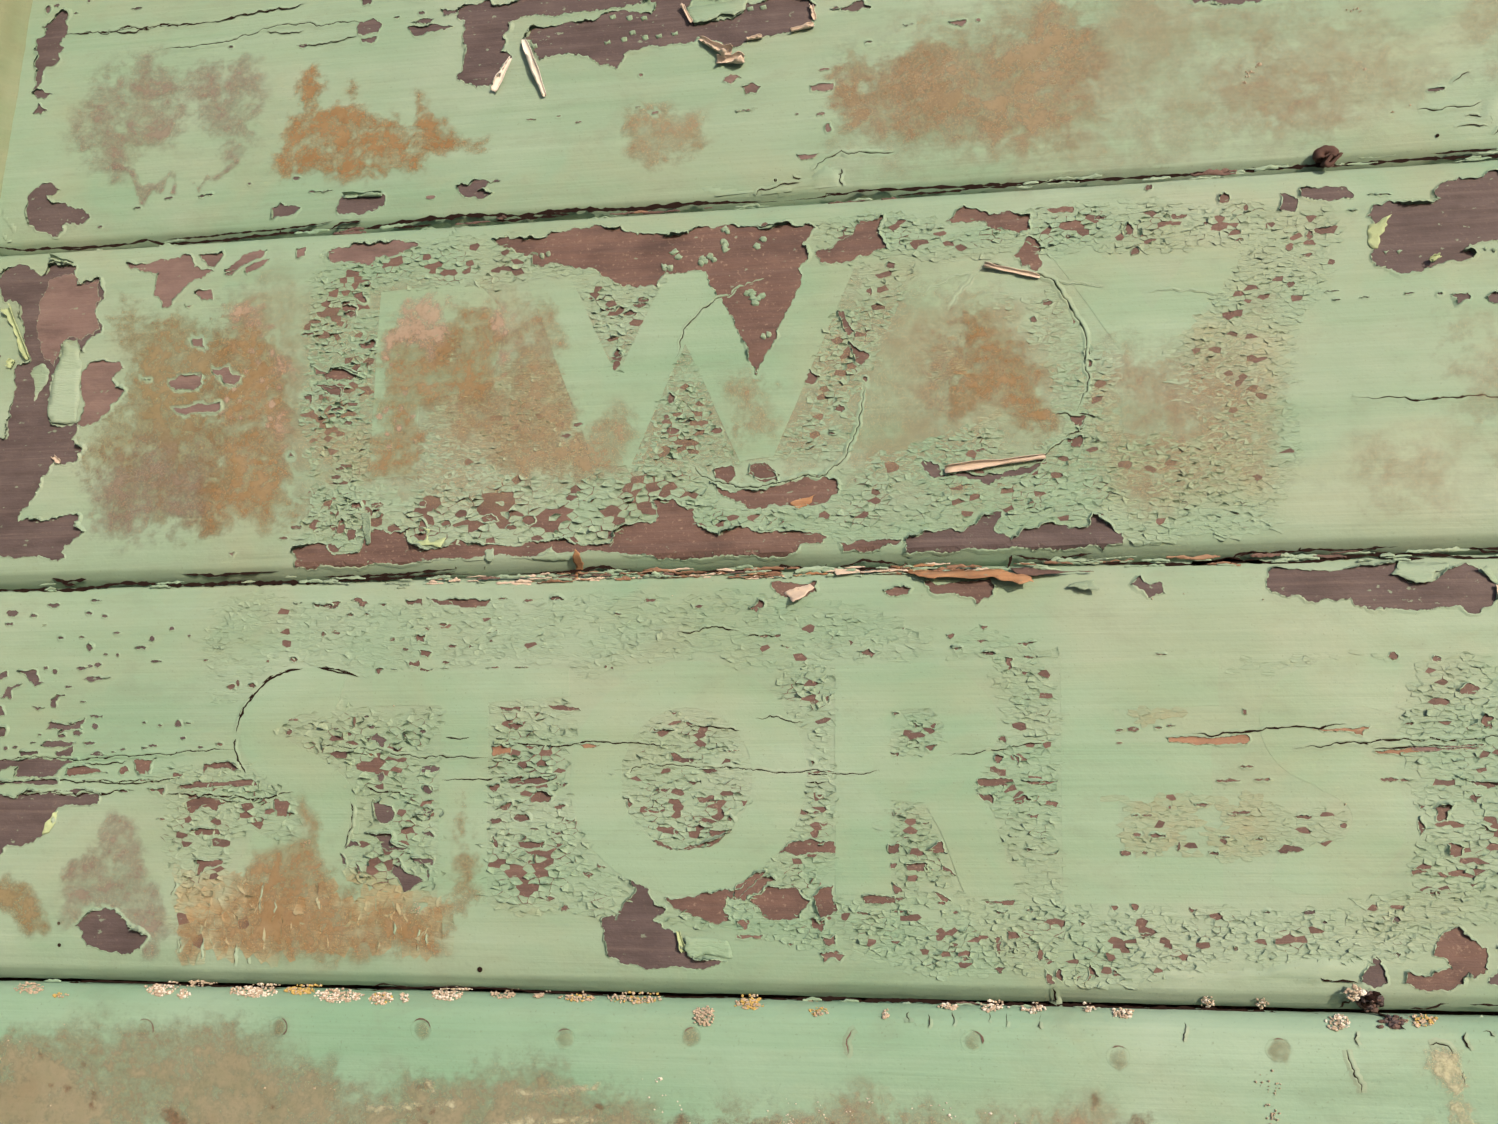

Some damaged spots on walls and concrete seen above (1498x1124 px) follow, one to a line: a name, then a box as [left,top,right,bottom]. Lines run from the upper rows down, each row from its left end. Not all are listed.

rust [277,67,477,178]
peeling [356,0,875,114]
spalling [796,152,820,161]
spalling [794,67,835,135]
spalling [1425,85,1447,94]
peeling [126,249,270,310]
peeling [0,182,243,563]
rust [90,310,288,534]
peeling [269,167,1498,572]
peeling [1264,559,1498,617]
peeling [0,573,1498,994]
rust [180,842,439,959]